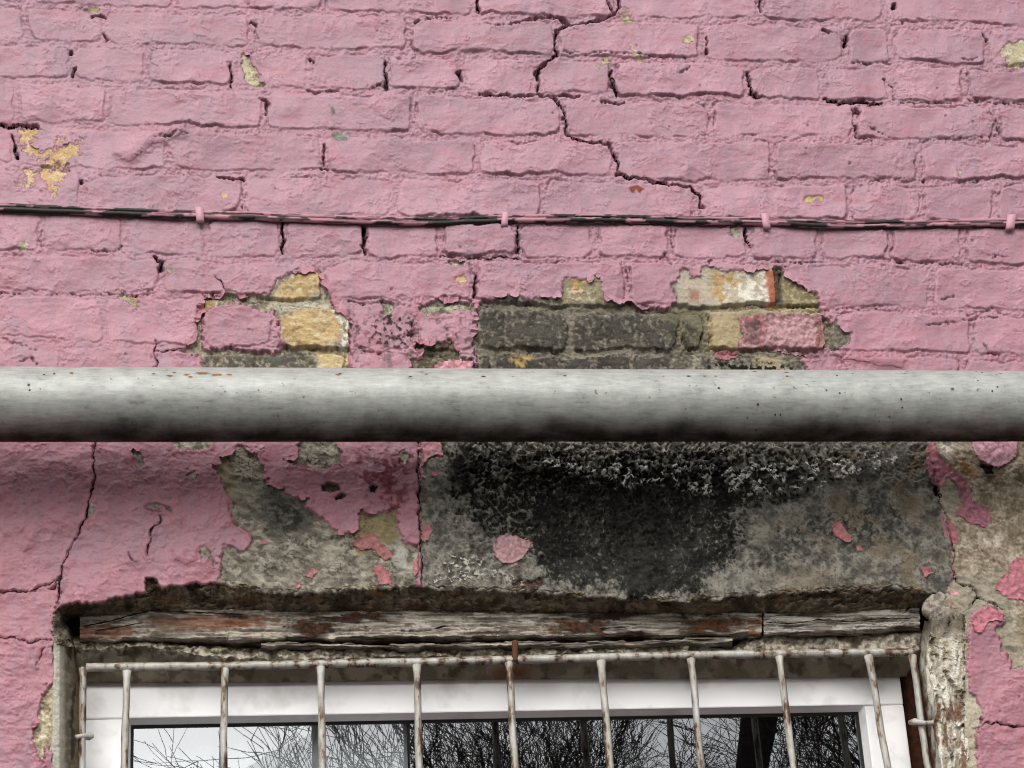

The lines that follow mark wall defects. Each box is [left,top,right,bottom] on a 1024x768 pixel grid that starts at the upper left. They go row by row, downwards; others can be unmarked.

crack [488,0,702,208]
peeling [16,128,85,198]
peeling [180,267,354,368]
peeling [411,261,851,370]
crack [2,442,96,604]
water stain [433,443,901,602]
rust [253,611,403,638]
spalling [50,442,1024,768]
rust [533,611,655,635]
rust [666,613,754,633]